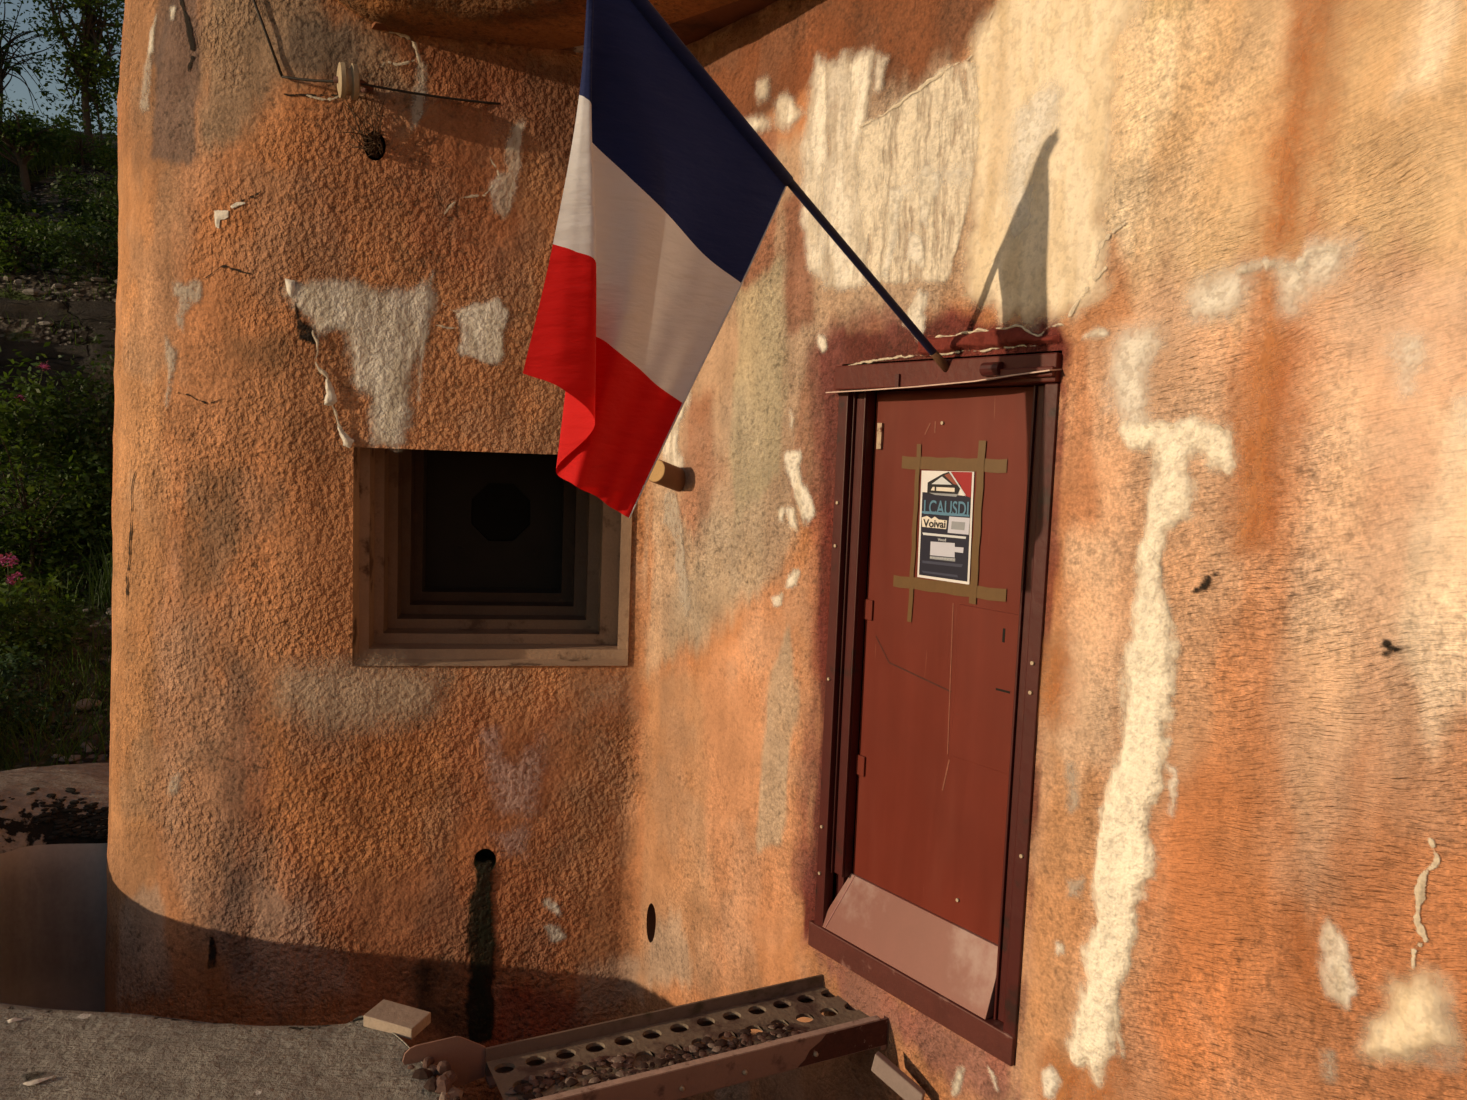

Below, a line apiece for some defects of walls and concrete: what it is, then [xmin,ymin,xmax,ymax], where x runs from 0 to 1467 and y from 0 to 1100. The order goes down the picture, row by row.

spalling [285,278,507,448]
damp [1068,330,1237,1085]
damp [465,729,541,1043]
efflorescence [1366,838,1454,1056]
damp [952,1071,962,1095]
damp [1042,1068,1058,1098]